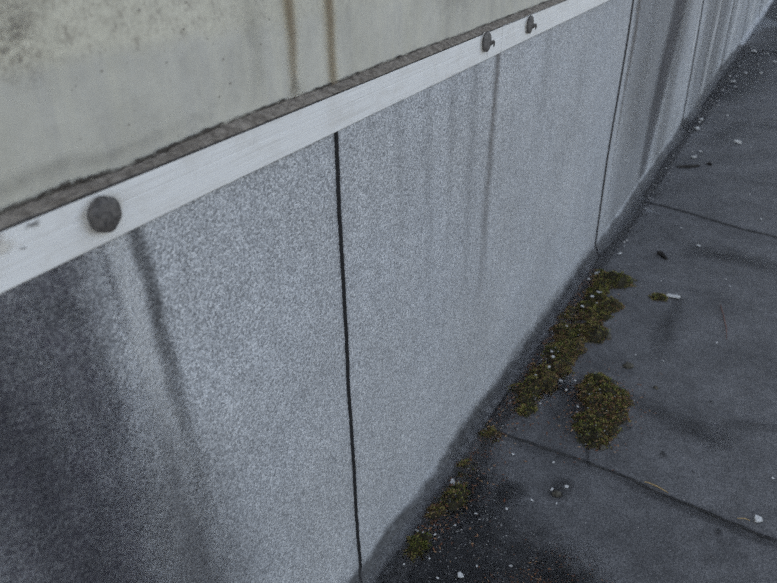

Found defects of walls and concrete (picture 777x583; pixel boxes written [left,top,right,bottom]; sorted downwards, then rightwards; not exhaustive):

damp [0,263,144,583]
damp [112,228,167,418]